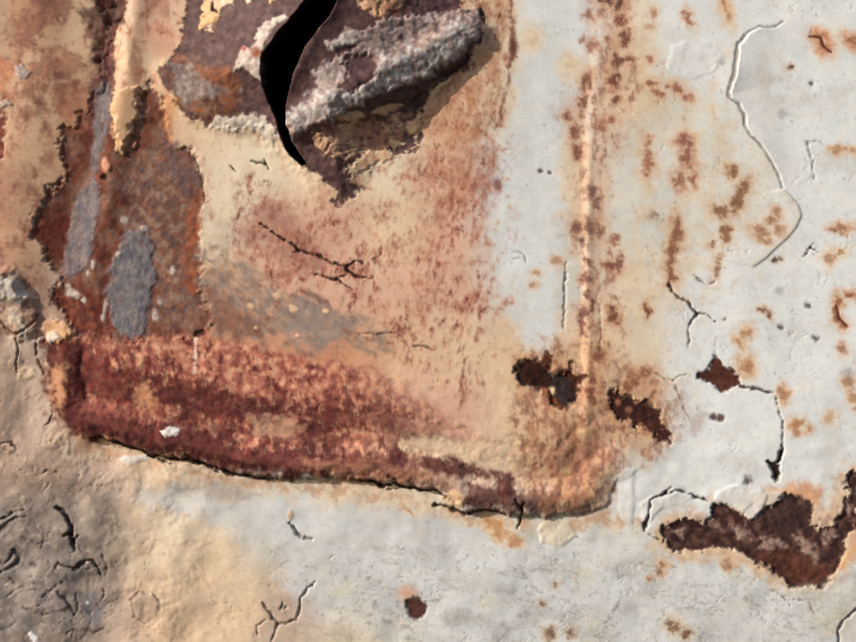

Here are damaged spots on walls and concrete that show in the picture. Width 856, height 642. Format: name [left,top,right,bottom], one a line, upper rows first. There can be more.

crack [259,221,383,291]
rust [0,0,791,554]
spalling [510,348,591,414]
crack [0,468,110,636]
peeling [42,420,71,455]
peeling [118,454,150,465]
peeling [440,488,467,508]
crack [641,486,710,542]
rust [641,491,790,598]
crack [739,383,786,460]
rust [747,457,856,522]
rust [833,532,856,579]